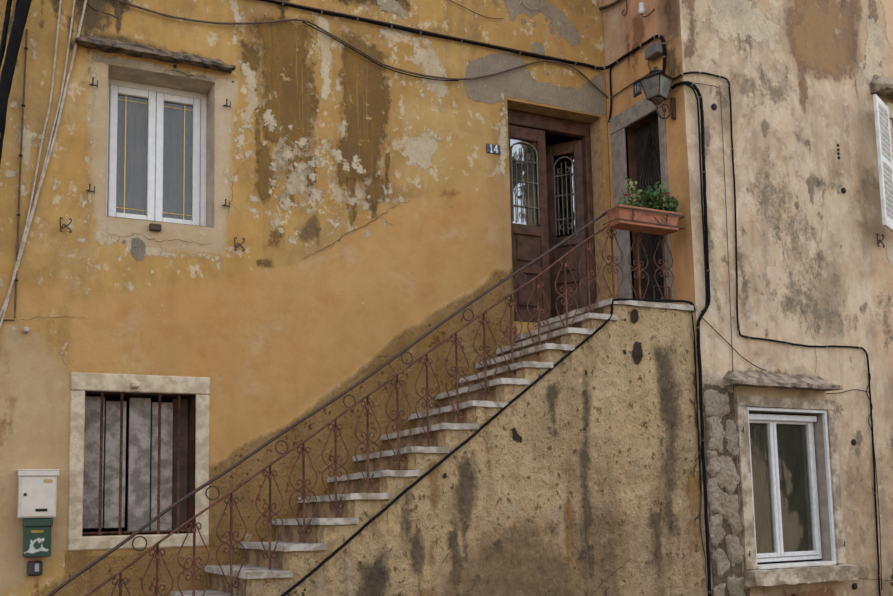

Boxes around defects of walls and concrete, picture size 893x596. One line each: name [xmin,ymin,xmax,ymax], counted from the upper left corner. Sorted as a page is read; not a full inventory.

spalling [91,51,216,81]
leakage [241,0,319,207]
peeling [227,58,404,245]
leakage [335,34,390,223]
peeling [376,0,456,112]
peeling [399,120,443,176]
leakage [737,0,882,111]
peeling [78,220,220,270]
leakage [270,230,284,246]
spalling [703,383,750,596]